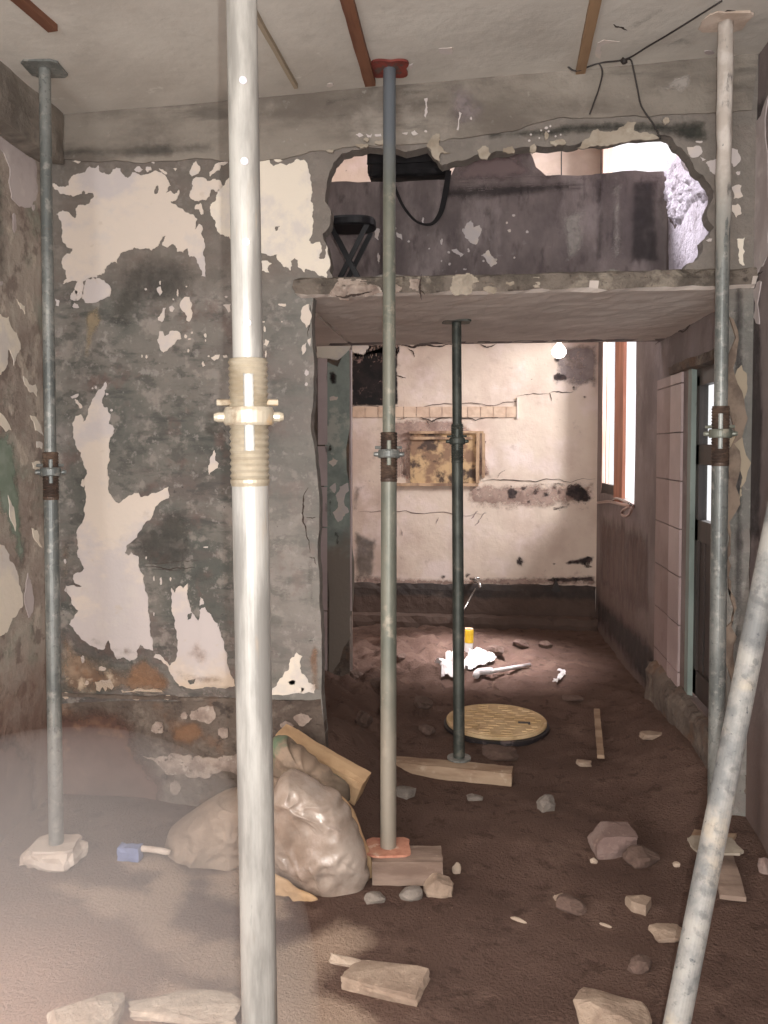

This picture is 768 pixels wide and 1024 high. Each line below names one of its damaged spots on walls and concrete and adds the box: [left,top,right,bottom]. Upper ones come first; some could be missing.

flaking render [528,121,659,154]
peeling [53,160,230,308]
water stain [119,267,180,312]
peeling [145,281,207,352]
peeling [260,159,382,300]
spalling [428,221,514,296]
flaking render [663,141,716,270]
crack [354,391,571,424]
water stain [554,347,595,398]
peeling [64,382,235,689]
peeling [0,544,34,636]
peeling [272,653,315,695]